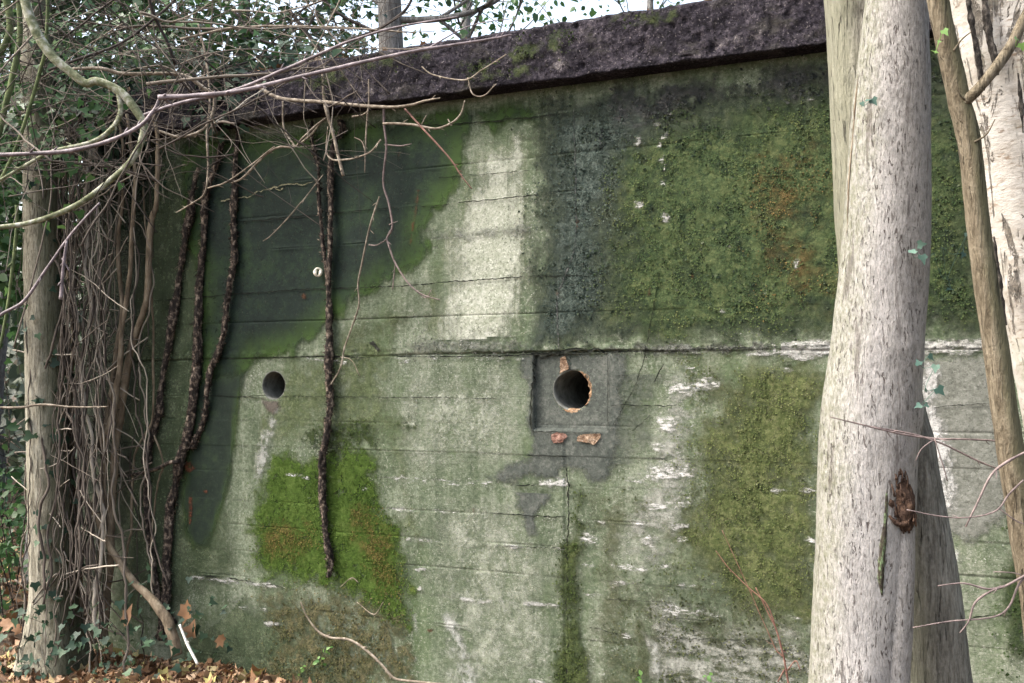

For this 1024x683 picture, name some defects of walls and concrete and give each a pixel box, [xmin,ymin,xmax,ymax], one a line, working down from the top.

water stain [436,136,531,340]
water stain [182,372,244,548]
water stain [402,377,506,459]
crack [134,110,828,682]
spalling [551,433,601,445]
water stain [472,351,719,588]
water stain [748,340,831,369]
water stain [192,576,285,588]
water stain [406,509,558,683]